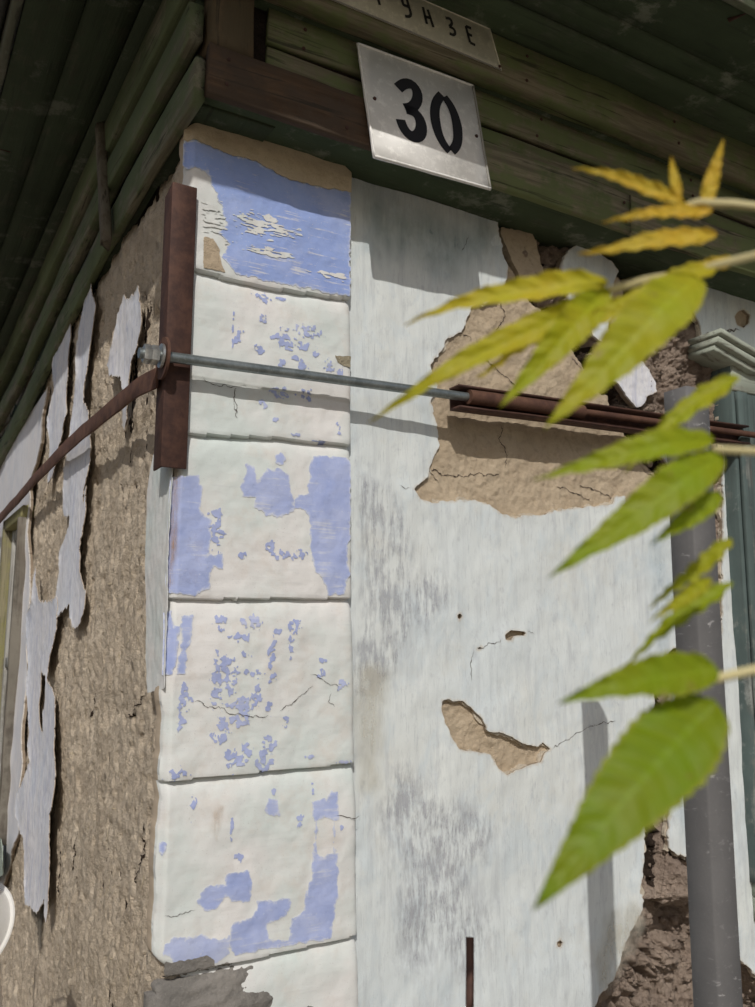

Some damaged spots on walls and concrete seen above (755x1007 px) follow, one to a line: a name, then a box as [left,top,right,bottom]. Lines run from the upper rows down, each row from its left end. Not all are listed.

spalling [431,300,540,371]
peeling [498,227,543,281]
crack [508,239,568,273]
crack [529,295,567,310]
crack [572,338,598,368]
peeling [555,245,623,299]
crack [601,321,739,450]
spalling [415,344,657,516]
crack [638,458,667,475]
peeling [0,123,352,1007]
spalling [442,700,547,771]
crack [641,818,669,899]